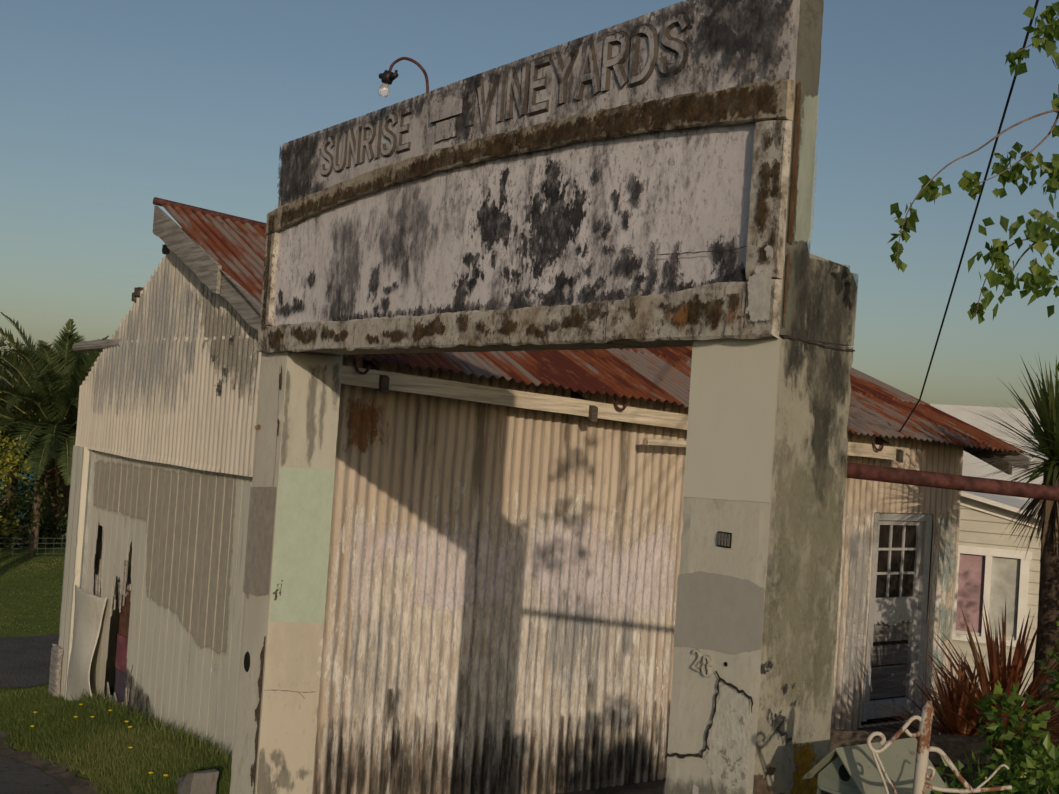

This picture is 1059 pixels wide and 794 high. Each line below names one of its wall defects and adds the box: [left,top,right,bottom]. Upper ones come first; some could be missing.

mould [275,179,438,321]
mould [449,158,692,312]
mould [706,234,746,282]
water stain [94,263,258,410]
corrosion [346,398,384,453]
water stain [785,244,858,507]
water stain [257,689,727,794]
crack [665,671,753,759]
mould [766,683,797,744]